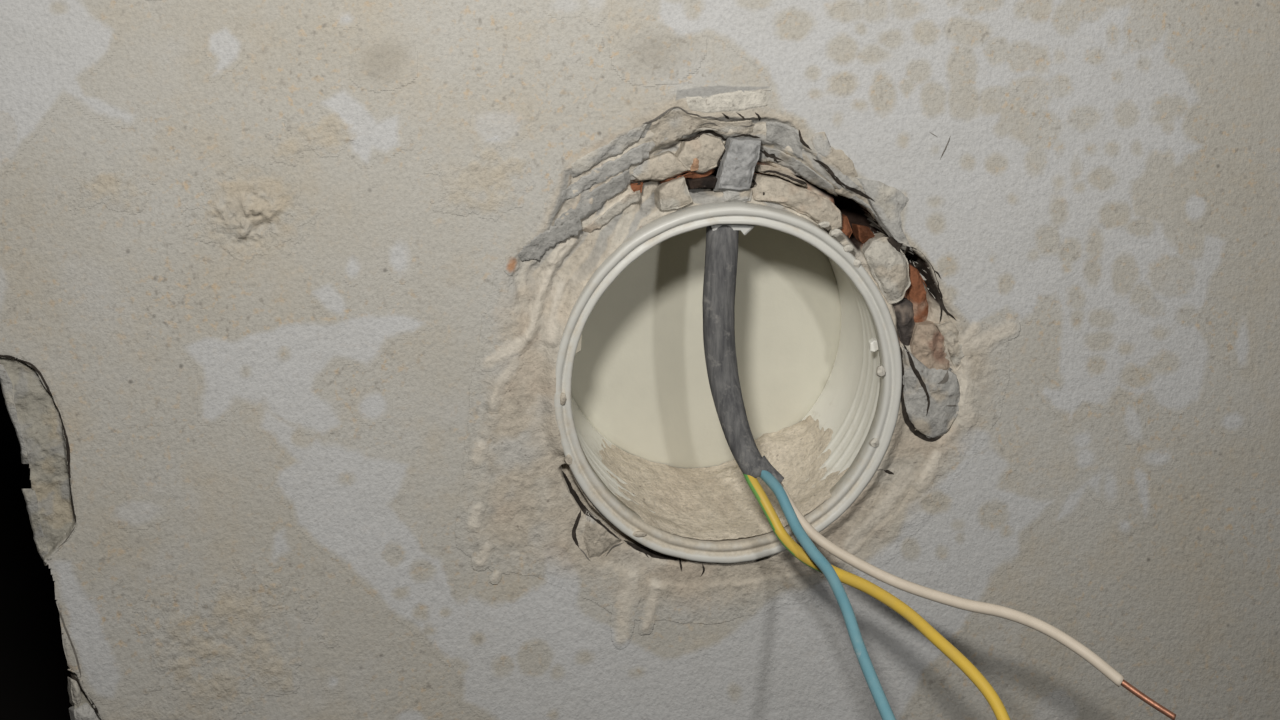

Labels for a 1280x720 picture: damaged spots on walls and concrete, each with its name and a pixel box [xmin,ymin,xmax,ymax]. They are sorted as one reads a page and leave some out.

spalling [0,356,77,566]
spalling [455,90,1009,624]
spalling [68,669,103,720]